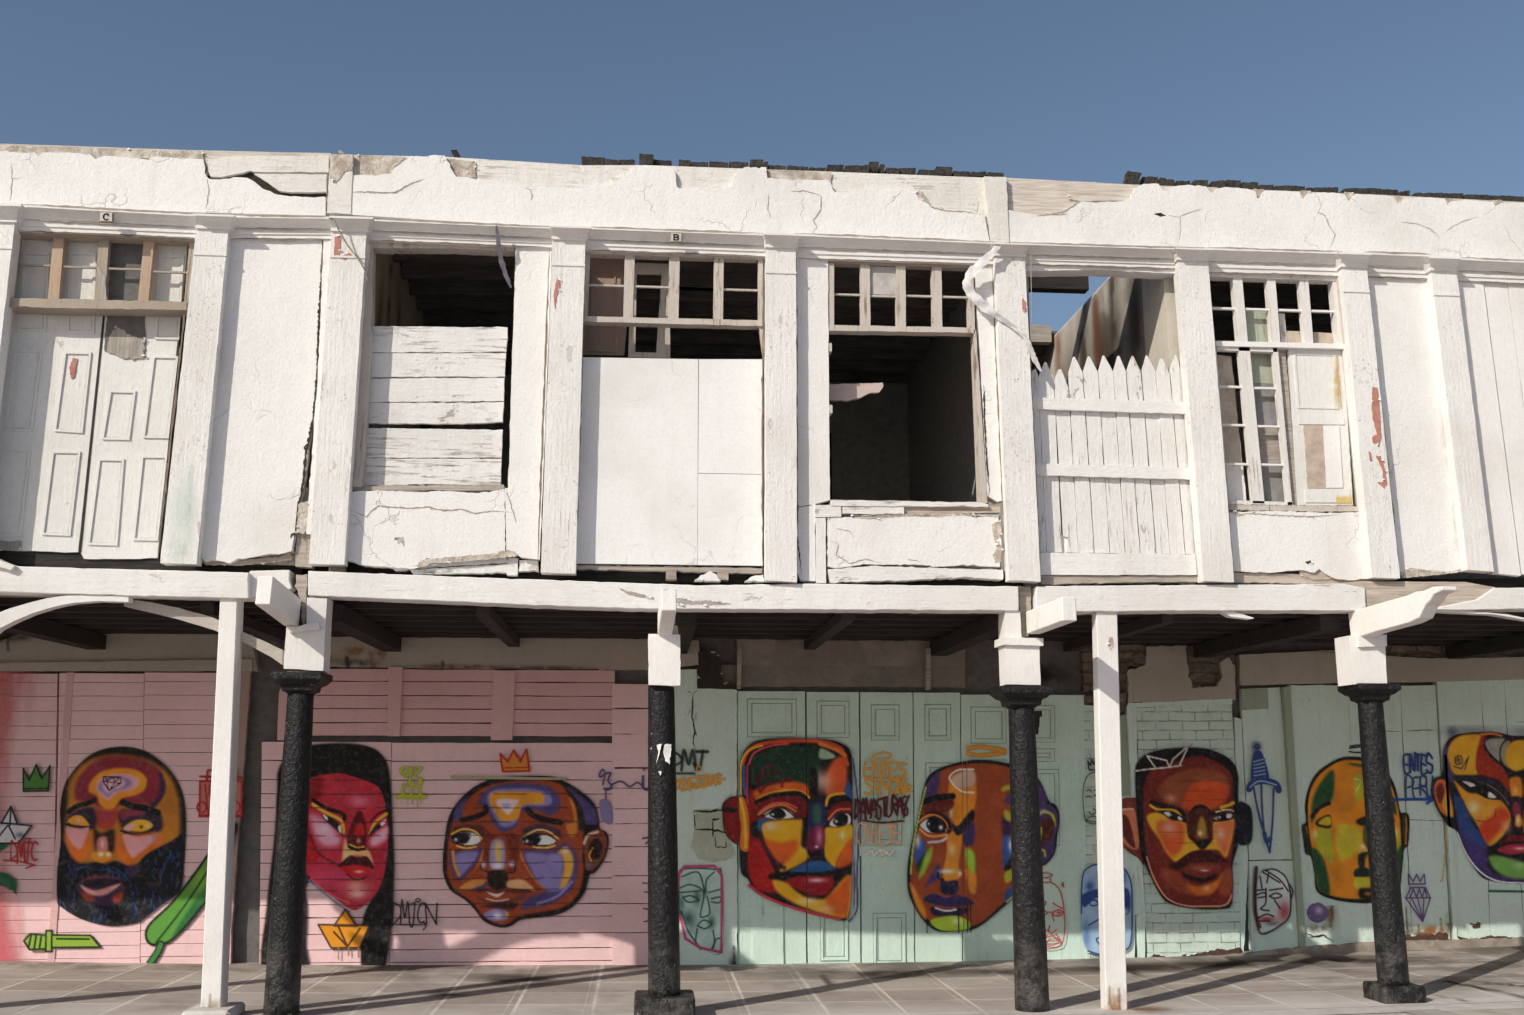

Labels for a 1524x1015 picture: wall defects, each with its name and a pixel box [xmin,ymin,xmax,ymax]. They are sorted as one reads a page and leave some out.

spalling [328,154,405,182]
spalling [447,158,476,178]
crack [204,160,425,205]
spalling [1066,181,1138,201]
crack [238,258,322,561]
crack [354,494,516,521]
spalling [1080,637,1236,713]